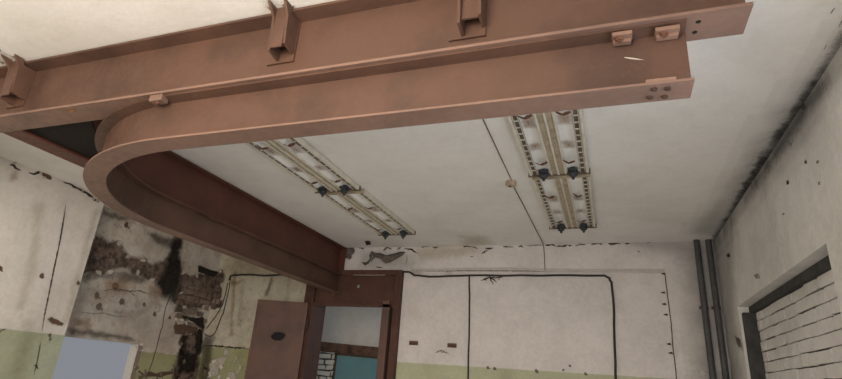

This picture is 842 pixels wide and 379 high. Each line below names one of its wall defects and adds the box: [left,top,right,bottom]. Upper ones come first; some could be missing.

damp [743,87,820,193]
peeling [362,241,407,268]
spalling [83,237,243,379]